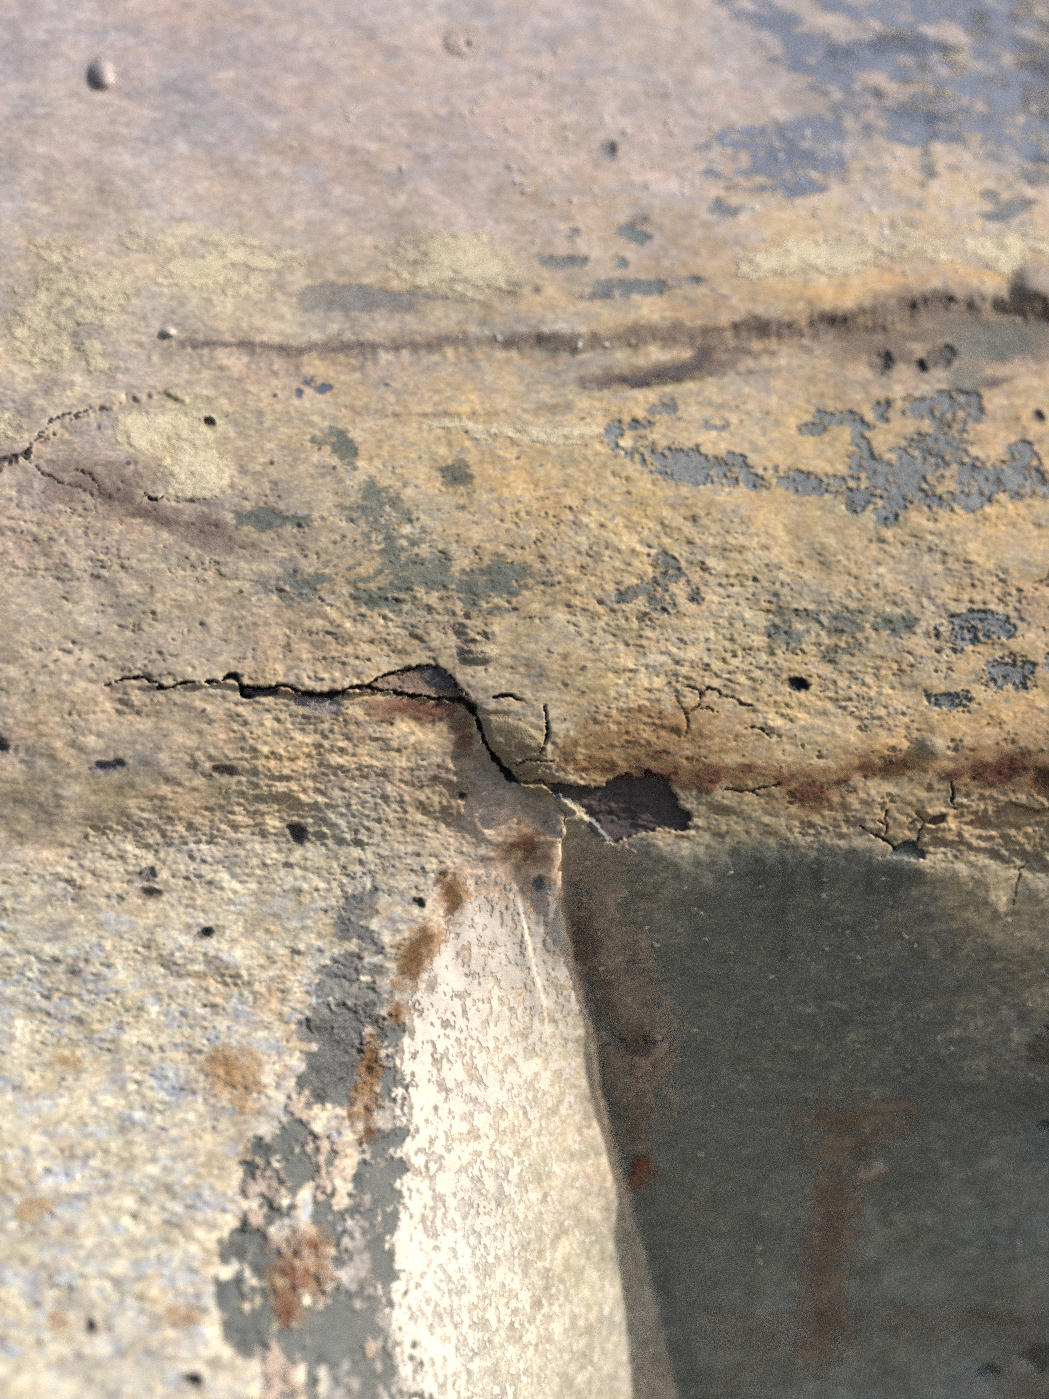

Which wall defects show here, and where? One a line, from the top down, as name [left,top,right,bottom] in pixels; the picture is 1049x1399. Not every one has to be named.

water stain [504,288,1049,392]
crack [0,408,99,497]
peeling [421,389,1049,527]
peeling [765,604,1049,712]
crack [103,665,552,783]
corrosion [582,750,757,793]
corrosion [945,750,1049,786]
peeling [482,714,691,1115]
corrosion [348,1105,378,1143]
flaking render [213,869,649,1399]
water stain [570,834,1049,1399]
corrosion [275,1236,320,1328]